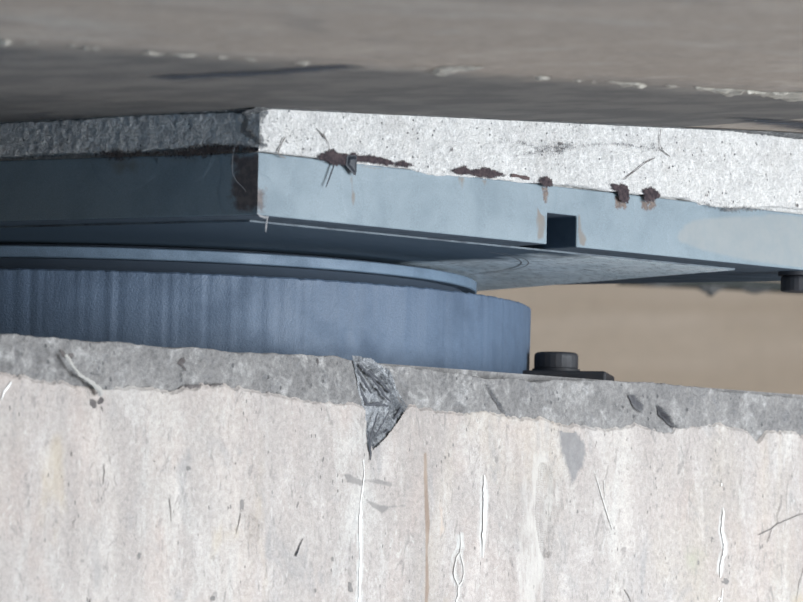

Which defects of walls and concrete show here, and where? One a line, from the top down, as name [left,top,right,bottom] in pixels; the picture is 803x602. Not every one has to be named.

corrosion [90,144,276,214]
corrosion [318,148,412,219]
corrosion [448,166,557,242]
corrosion [605,183,666,233]
spalling [352,356,407,460]
crack [348,445,373,602]
crack [712,483,734,602]